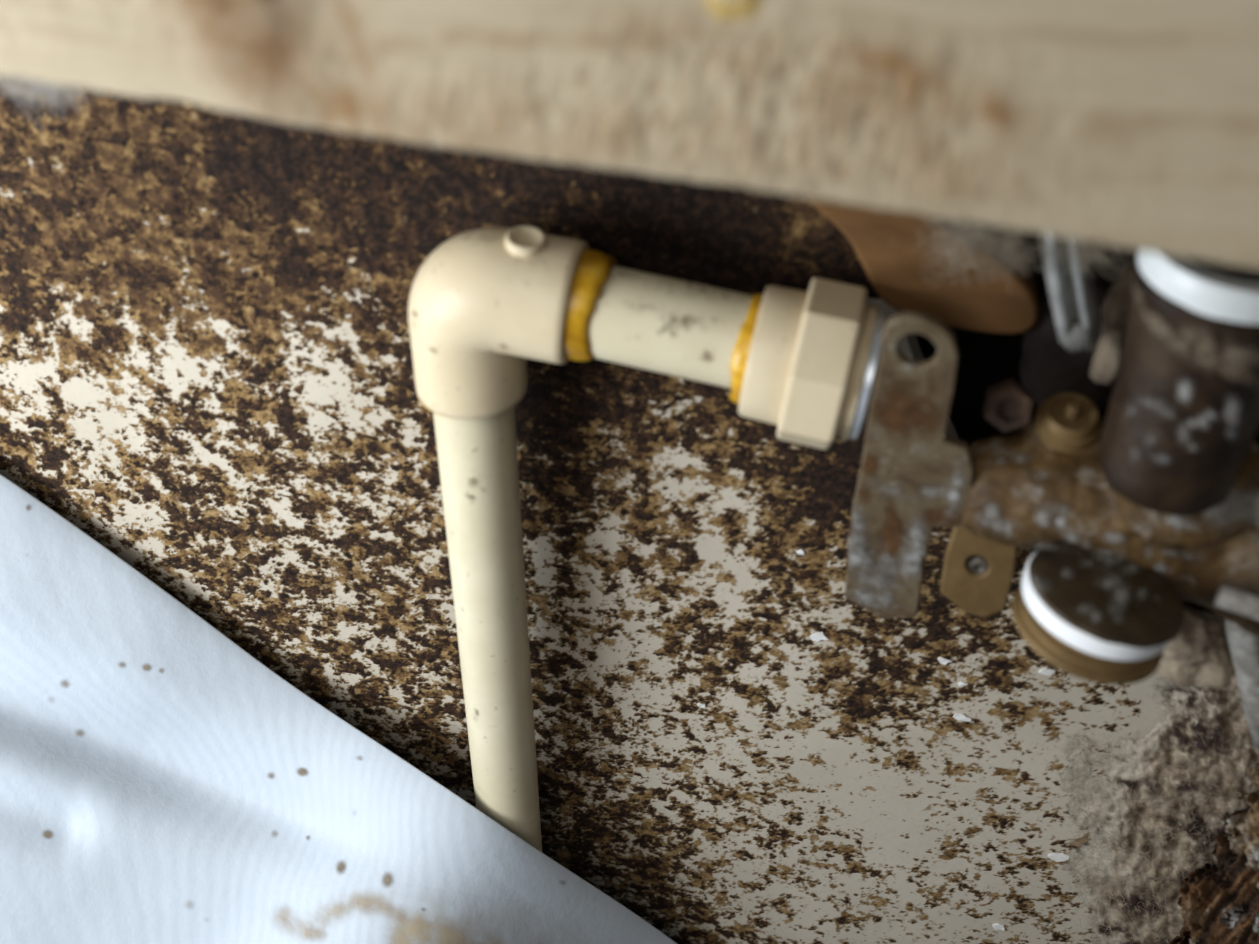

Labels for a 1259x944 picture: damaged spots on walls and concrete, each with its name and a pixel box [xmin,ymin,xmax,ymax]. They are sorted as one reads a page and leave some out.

damp [1180,383,1191,400]
damp [0,76,881,806]
damp [1181,402,1240,439]
damp [514,358,1141,944]
damp [335,898,465,944]
damp [1224,910,1243,928]